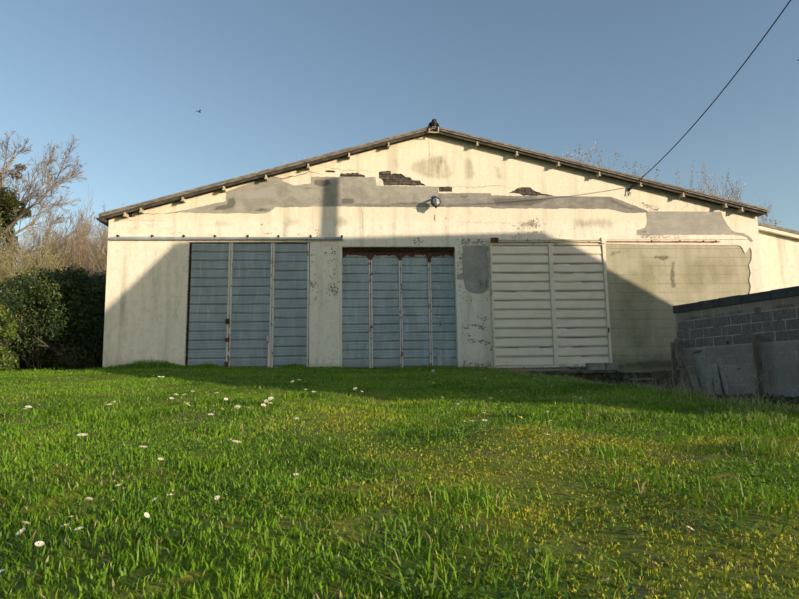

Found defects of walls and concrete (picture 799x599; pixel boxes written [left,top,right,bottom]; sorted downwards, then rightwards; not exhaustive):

spalling [377,171,425,186]
spalling [509,188,552,196]
rust [343,251,454,262]